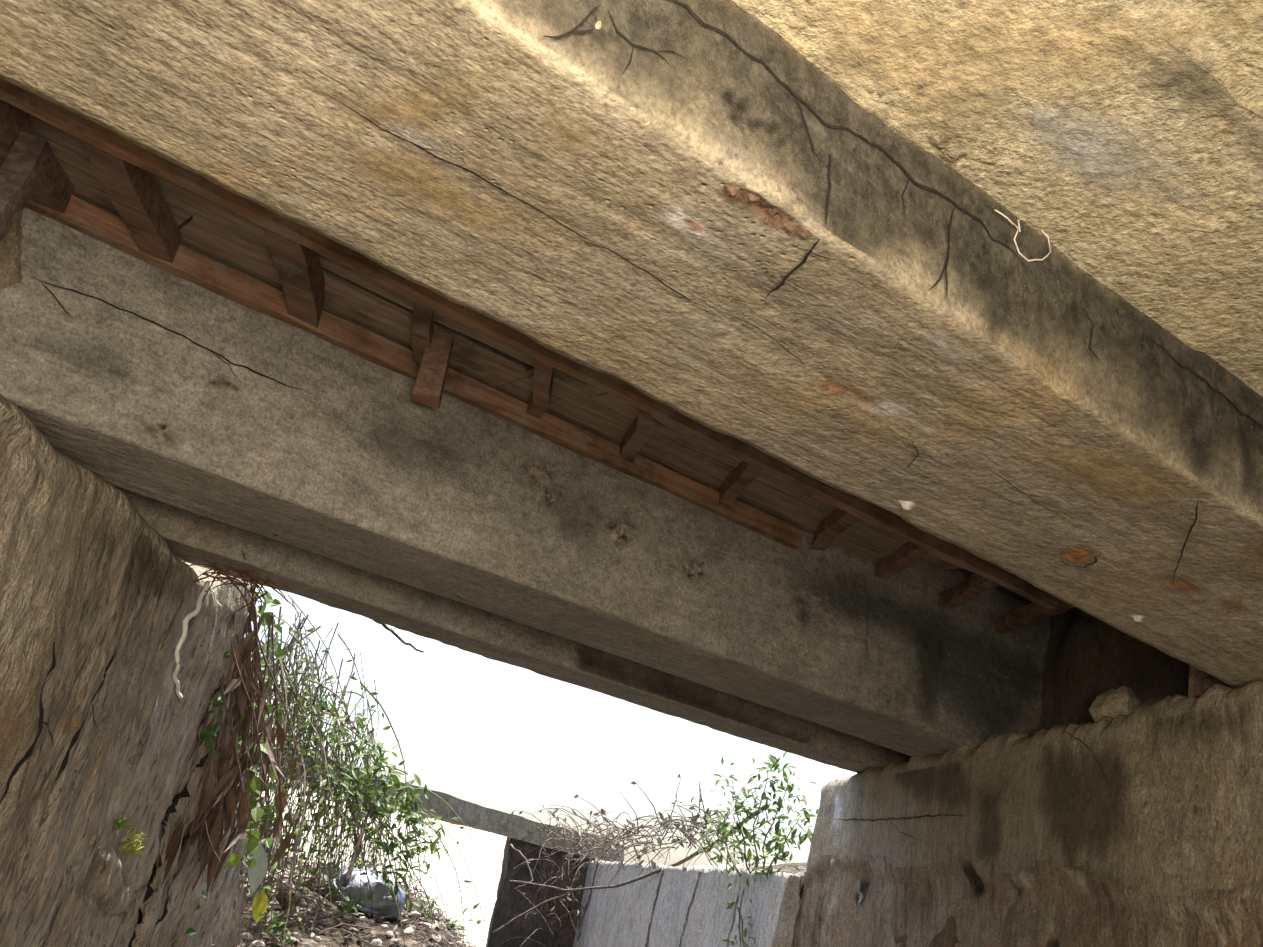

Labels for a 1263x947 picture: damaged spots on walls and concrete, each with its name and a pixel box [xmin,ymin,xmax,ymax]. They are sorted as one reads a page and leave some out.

crack [544,5,689,76]
crack [328,95,704,307]
crack [670,0,1036,305]
damp [700,0,1263,477]
crack [27,274,320,398]
crack [733,316,805,366]
damp [897,500,917,511]
crack [1172,502,1198,583]
crack [0,642,118,813]
crack [128,679,230,947]
crack [838,814,968,840]
spalling [791,735,1263,947]